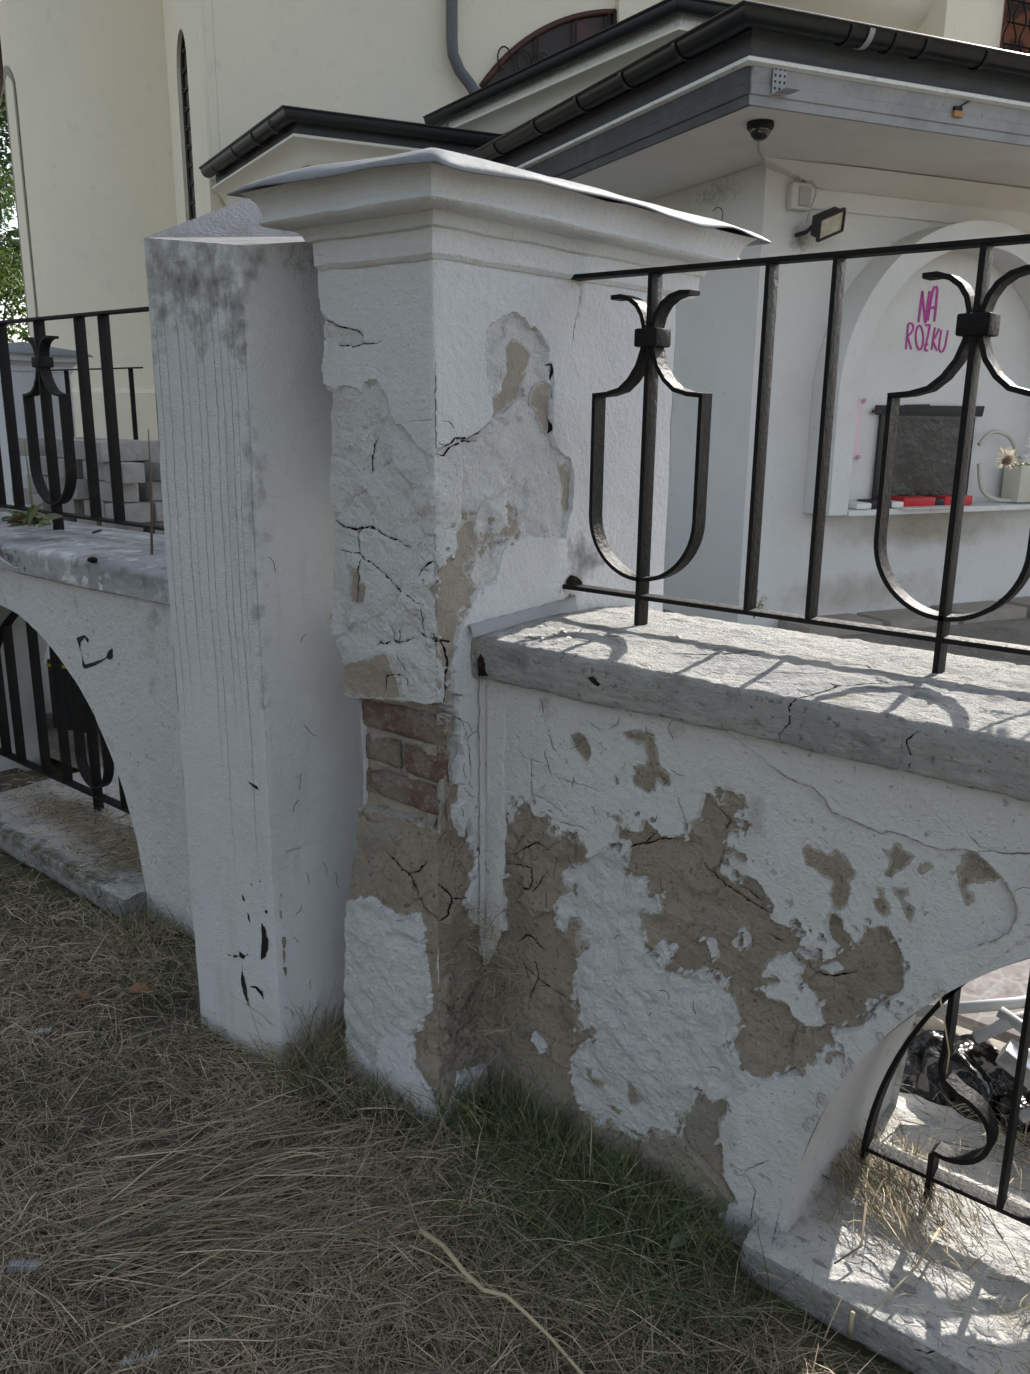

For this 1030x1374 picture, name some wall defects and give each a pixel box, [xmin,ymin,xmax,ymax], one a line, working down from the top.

crack [327,320,382,348]
crack [409,363,489,456]
crack [546,294,581,433]
crack [336,520,471,768]
crack [677,651,968,743]
peeling [326,313,1018,1230]